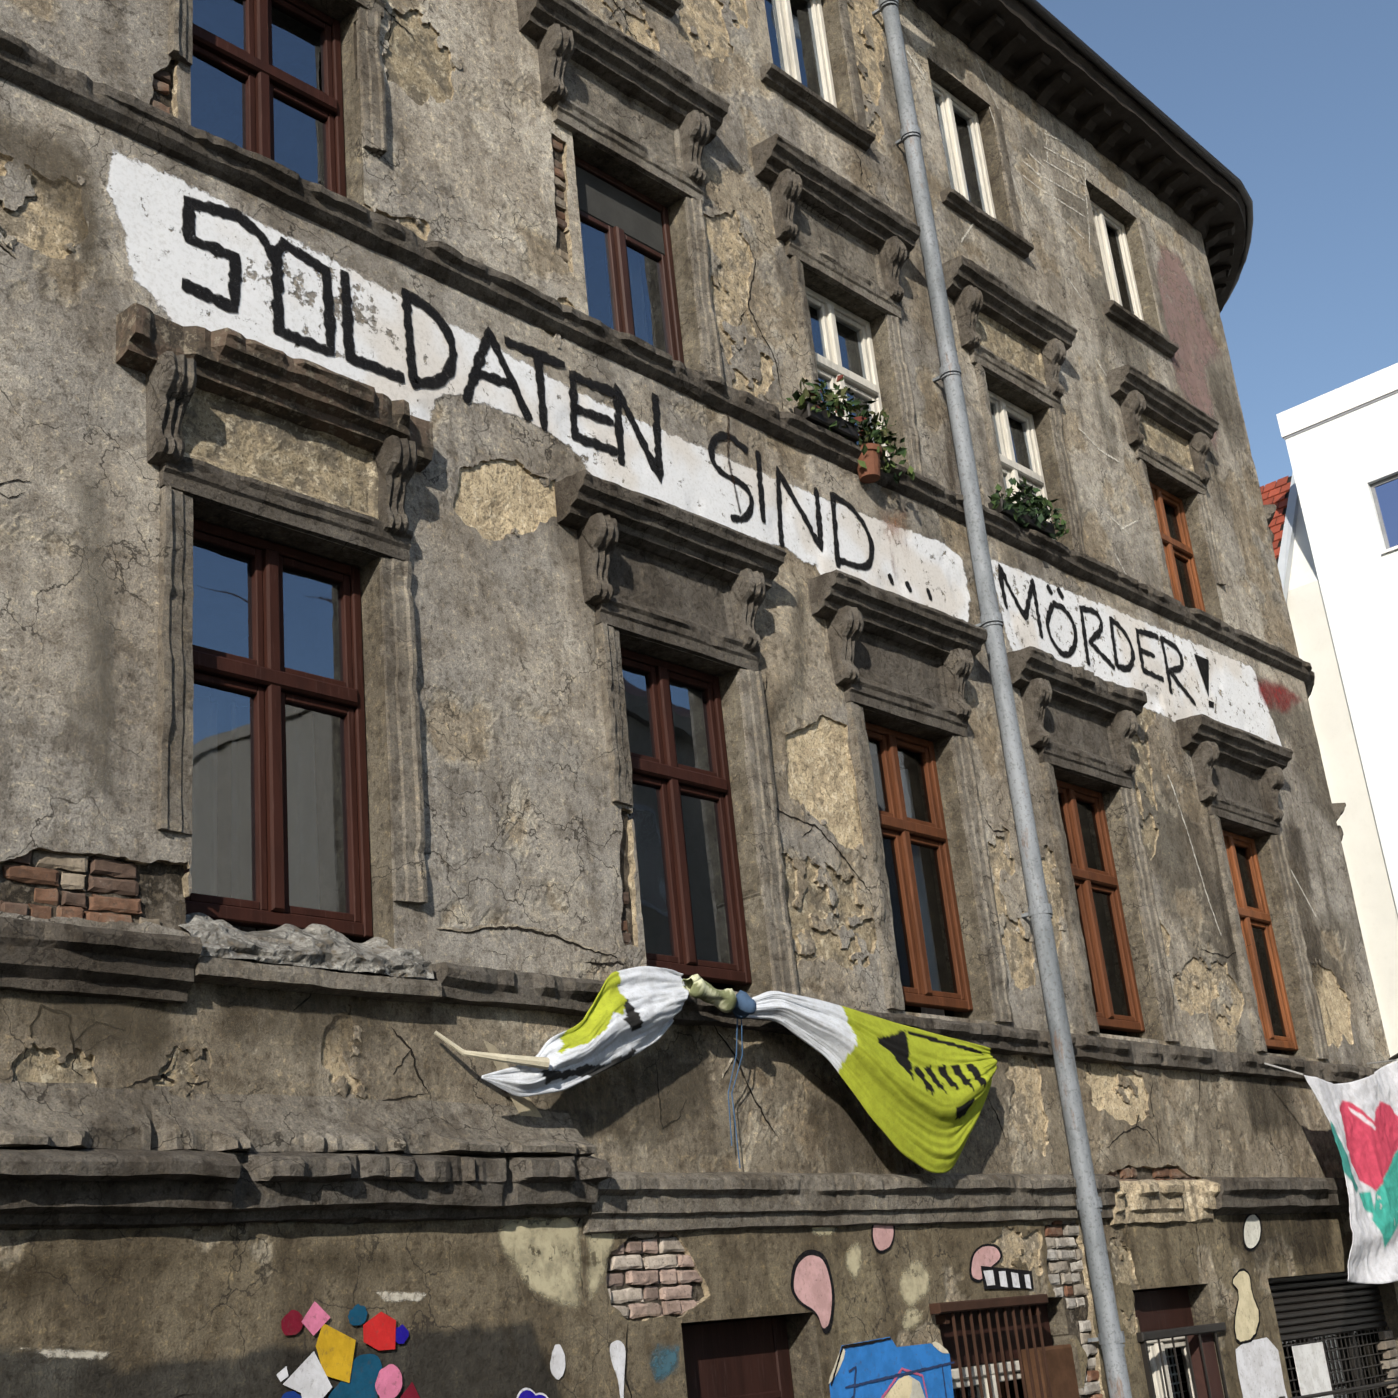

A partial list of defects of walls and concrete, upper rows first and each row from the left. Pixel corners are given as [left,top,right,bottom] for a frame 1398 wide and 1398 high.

spalling [380,2,463,106]
spalling [0,156,85,259]
spalling [704,211,773,403]
spalling [453,459,557,541]
spalling [785,715,867,858]
flaking render [0,850,190,934]
crack [437,923,626,966]
spalling [782,853,877,968]
crack [24,1004,126,1076]
crack [127,1050,207,1088]
peeling [1083,1063,1157,1127]
flaking render [606,1232,704,1322]